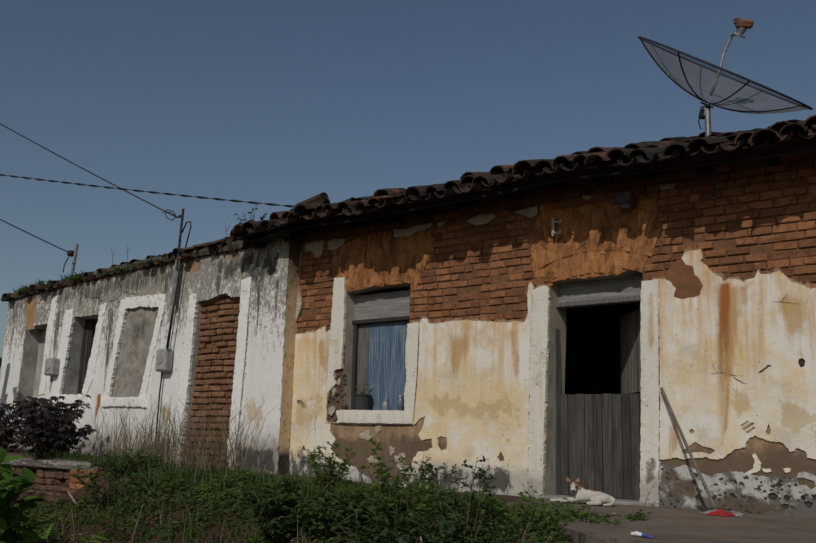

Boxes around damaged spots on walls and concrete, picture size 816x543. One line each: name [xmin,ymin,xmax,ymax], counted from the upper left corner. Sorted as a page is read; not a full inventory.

leakage [44,267,173,358]
leakage [104,308,116,390]
leakage [216,250,279,328]
flaking render [295,151,816,334]
corrosion [718,284,746,377]
flaking render [326,345,447,484]
flaking render [660,420,816,513]